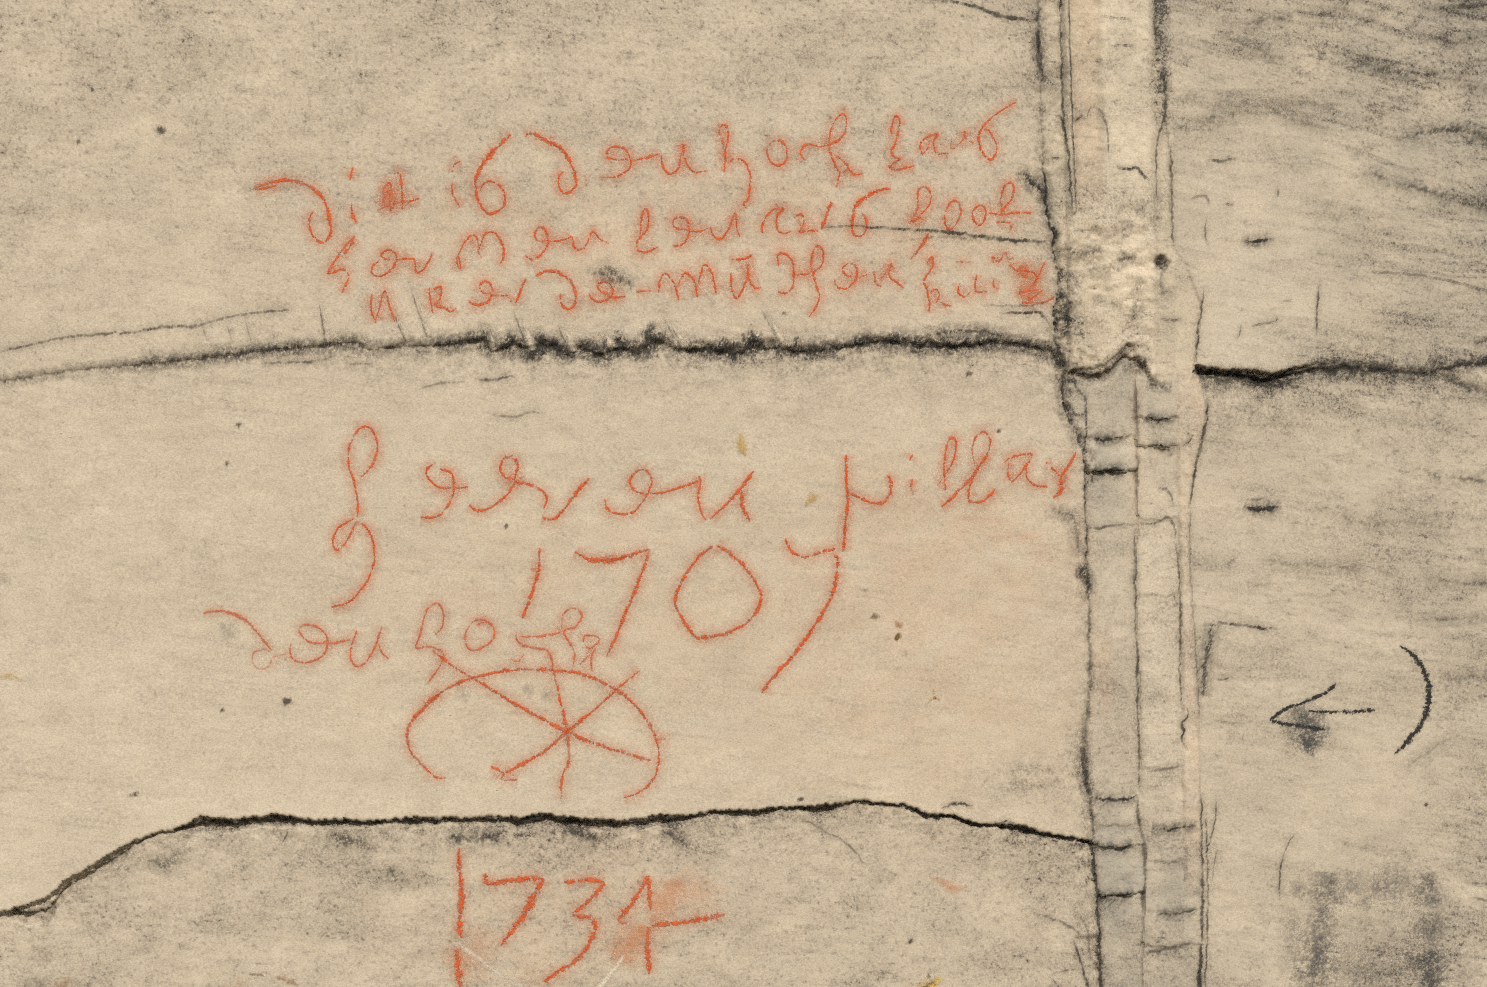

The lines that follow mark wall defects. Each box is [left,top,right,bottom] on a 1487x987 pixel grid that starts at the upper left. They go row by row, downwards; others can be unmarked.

crack [4,289,1487,987]